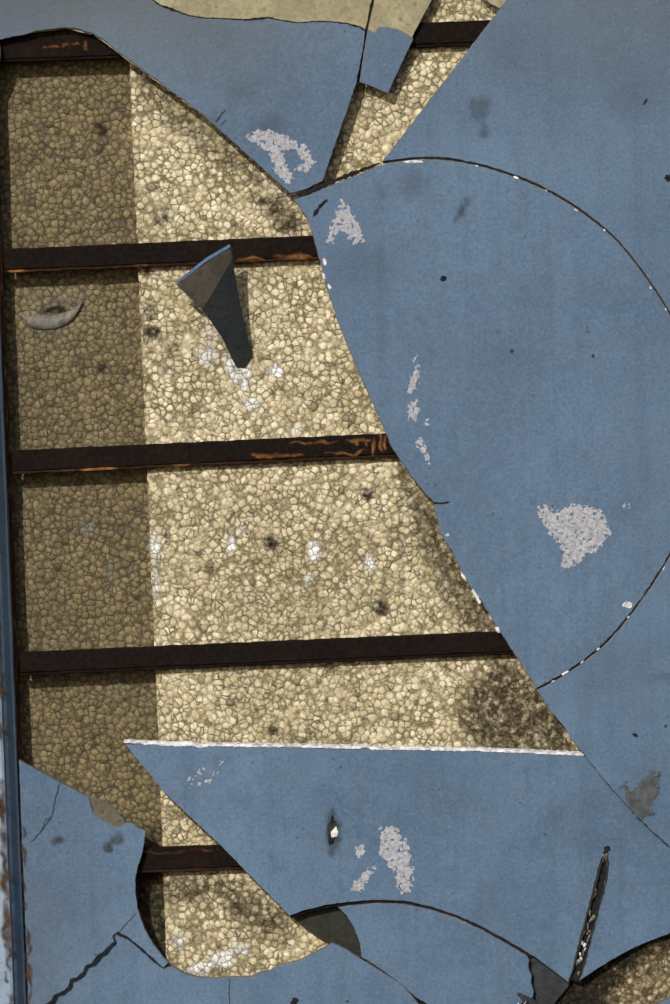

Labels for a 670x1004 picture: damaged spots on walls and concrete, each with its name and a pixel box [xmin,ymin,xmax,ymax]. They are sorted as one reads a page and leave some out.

peeling [155,0,432,37]
peeling [29,28,316,184]
peeling [326,198,366,245]
crack [291,157,670,314]
peeling [407,355,430,426]
peeling [537,503,612,569]
crack [537,554,670,690]
peeling [619,769,661,820]
rust [0,792,13,966]
peeling [351,826,415,894]
crack [46,913,163,1004]
peeling [506,940,570,1004]